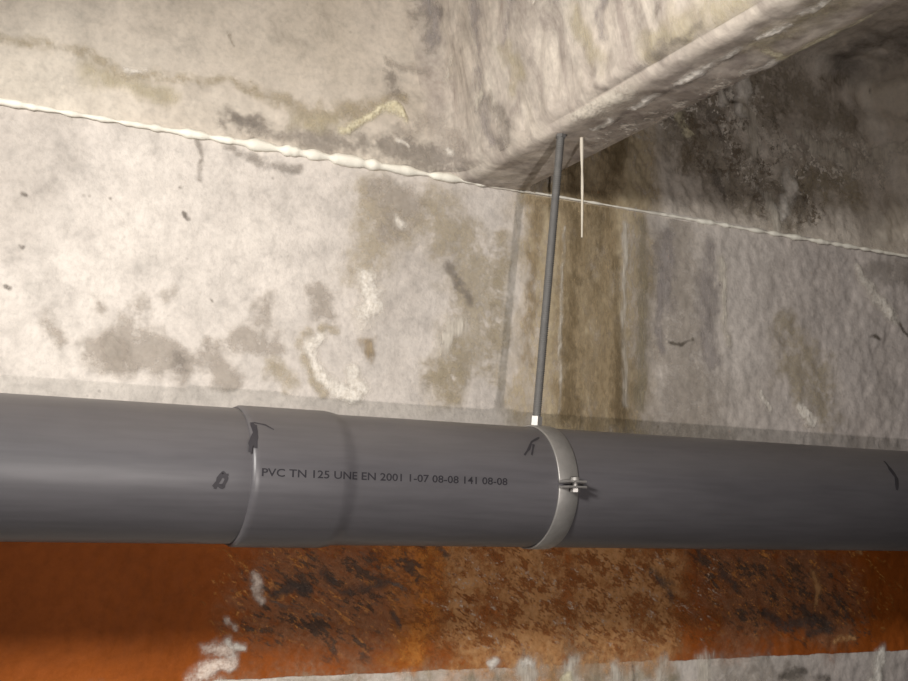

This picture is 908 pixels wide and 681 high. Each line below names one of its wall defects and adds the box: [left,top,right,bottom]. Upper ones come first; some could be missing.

water stain [588,30,908,232]
water stain [213,545,443,668]
water stain [518,658,537,681]
water stain [551,658,578,681]